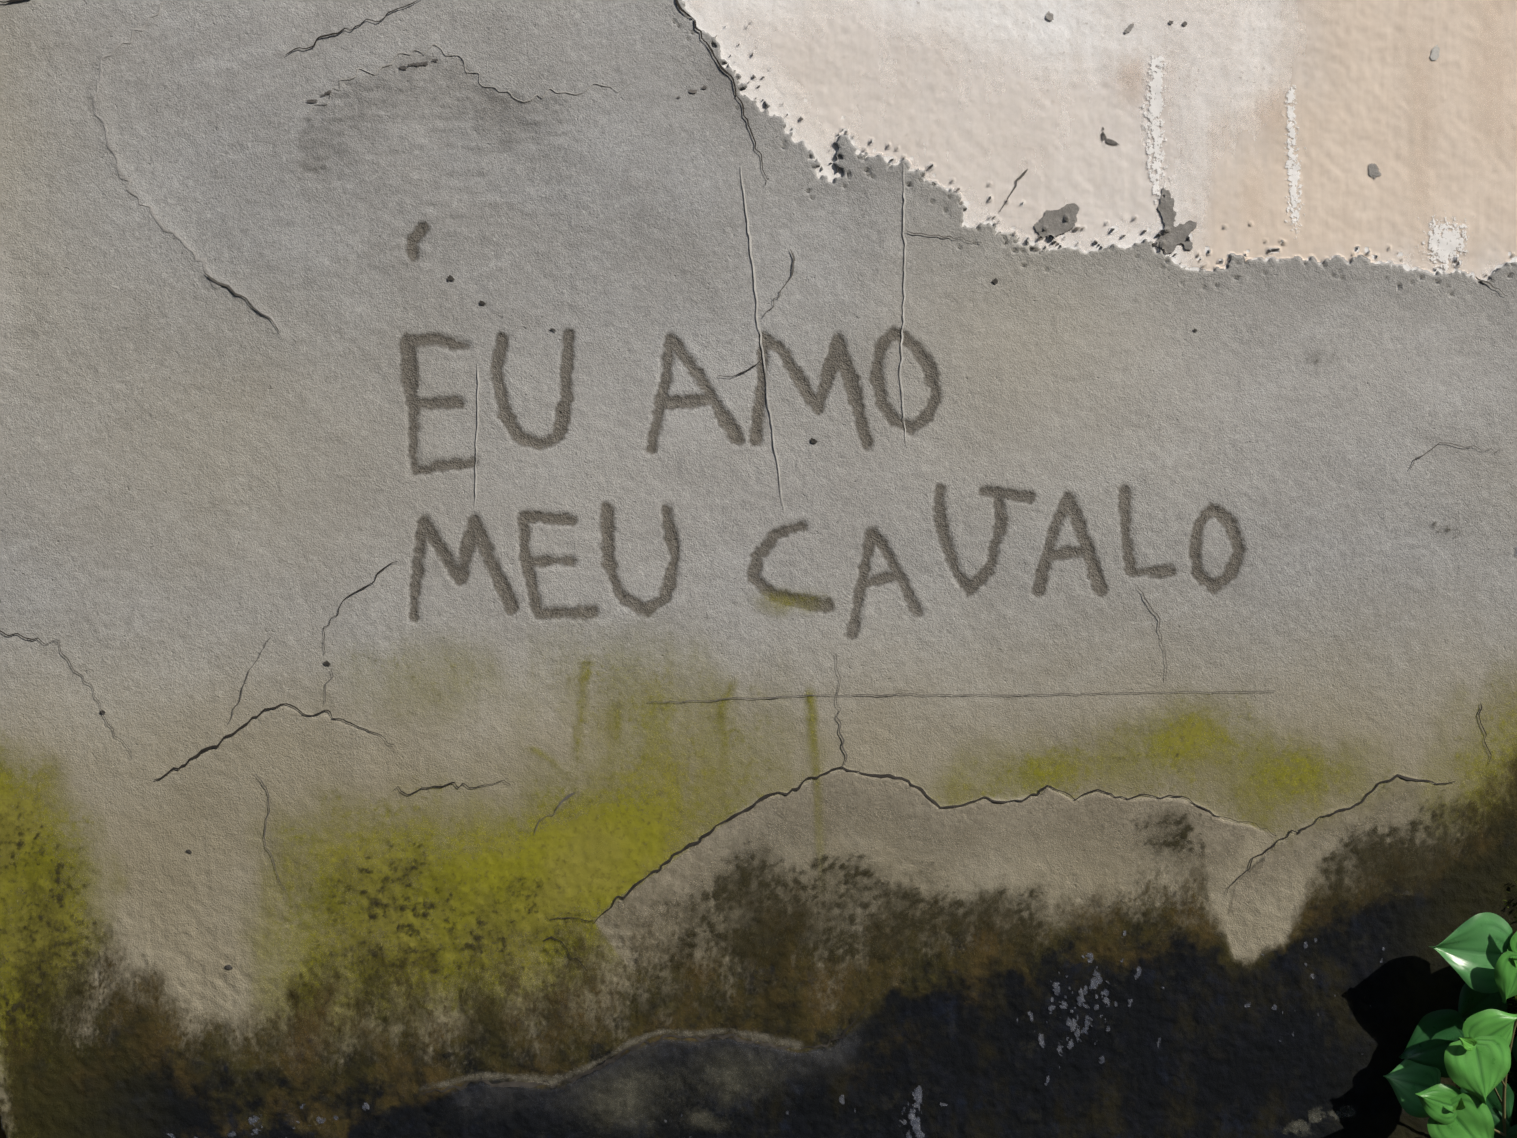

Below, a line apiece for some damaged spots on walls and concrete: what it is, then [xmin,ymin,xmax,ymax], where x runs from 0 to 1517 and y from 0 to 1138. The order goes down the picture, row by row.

peeling [307,43,631,114]
crack [675,0,767,185]
leakage [1205,0,1517,272]
peeling [1368,164,1381,178]
crack [0,561,398,780]
crack [255,774,286,890]
crack [394,780,509,795]
crack [543,585,1455,969]
crack [1478,703,1491,765]
leakage [0,759,1517,1138]